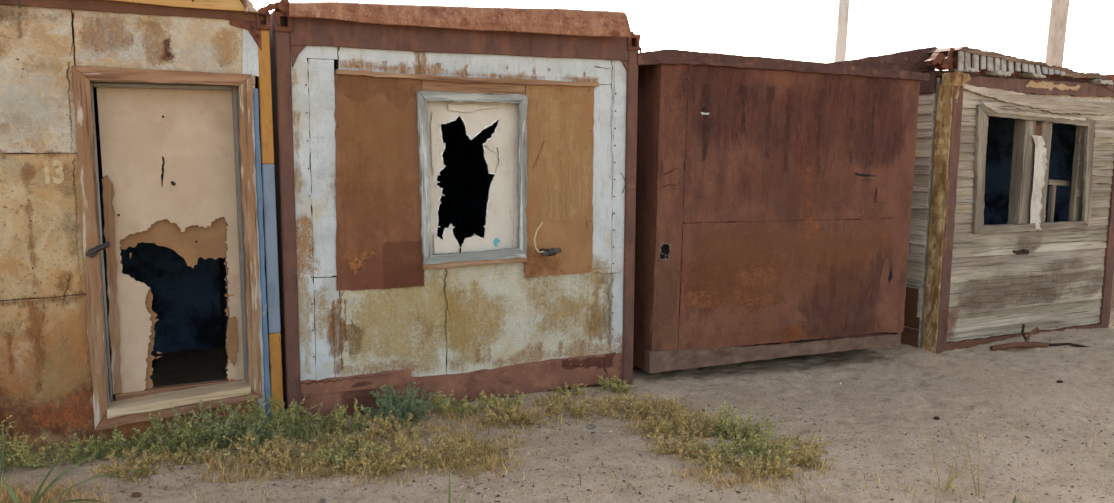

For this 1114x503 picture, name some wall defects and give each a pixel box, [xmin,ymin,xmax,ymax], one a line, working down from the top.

rust [143,23,174,61]
rust [296,215,314,341]
rust [321,280,453,373]
crack [441,249,461,371]
rust [533,260,613,343]
rust [0,387,94,440]